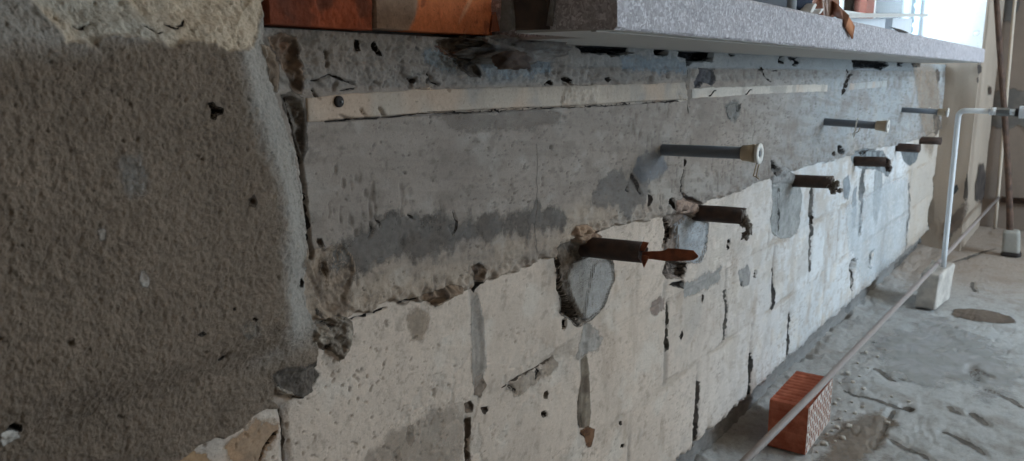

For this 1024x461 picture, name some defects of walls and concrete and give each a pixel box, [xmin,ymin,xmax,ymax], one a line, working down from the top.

spalling [435,12,500,78]
crack [310,51,689,122]
crack [302,193,311,240]
crack [625,174,653,206]
spalling [662,192,709,289]
crack [774,188,782,231]
spalling [770,160,802,239]
spalling [300,238,356,323]
crack [350,298,416,319]
spalling [471,263,487,292]
spalling [554,238,615,329]
spalling [464,401,488,414]